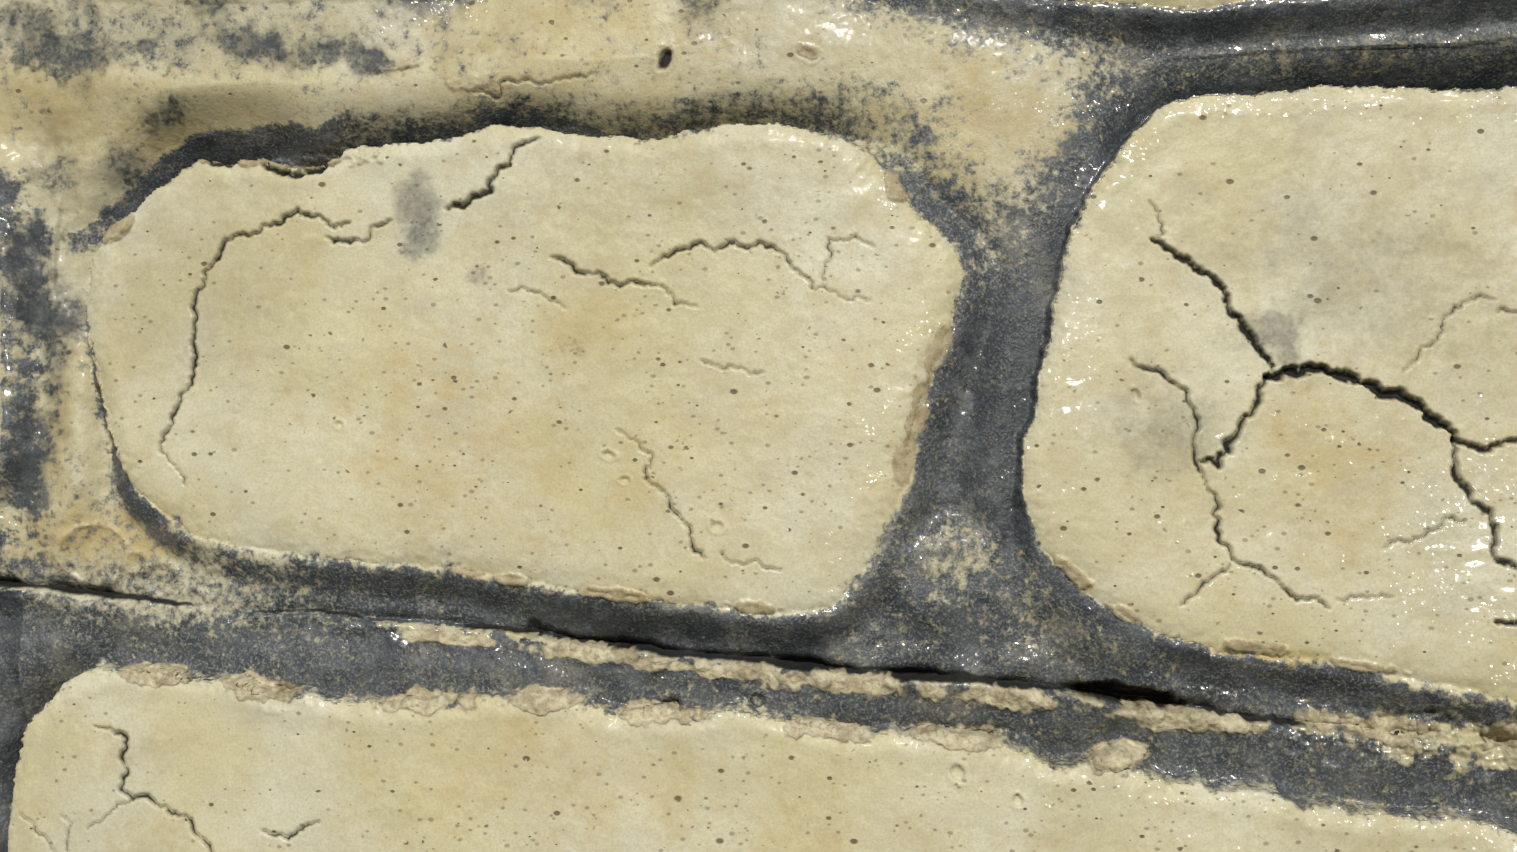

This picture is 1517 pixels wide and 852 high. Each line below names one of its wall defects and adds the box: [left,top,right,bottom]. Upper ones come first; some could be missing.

damp [11,5,108,81]
damp [217,27,391,73]
damp [0,218,82,371]
crack [161,149,390,479]
crack [1133,223,1517,607]
damp [8,406,62,503]
crack [0,580,191,606]
spalling [219,670,306,703]
spalling [374,684,476,716]
crack [464,623,1064,689]
spalling [508,638,1261,776]
spalling [1293,706,1445,748]